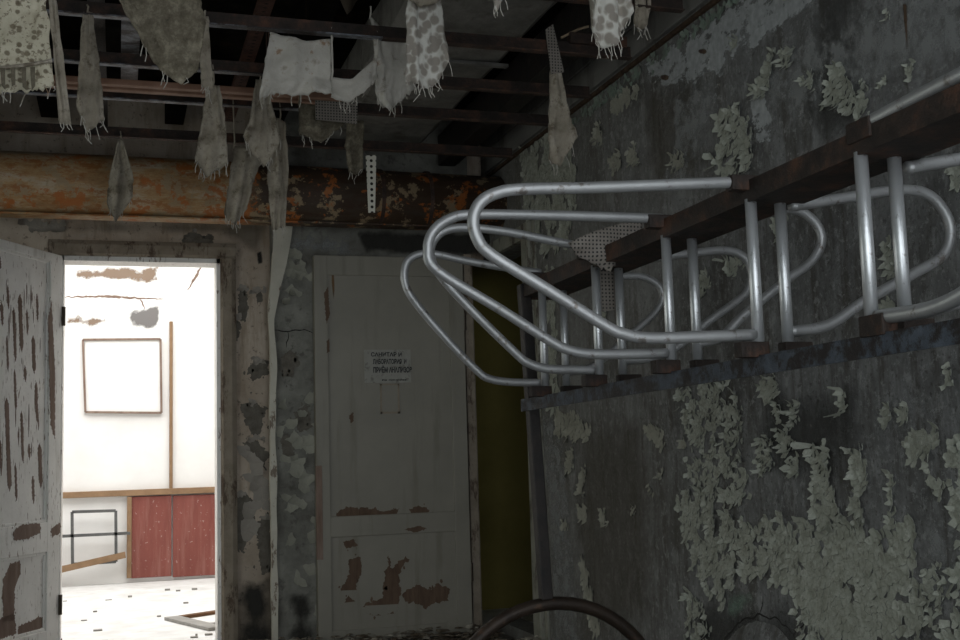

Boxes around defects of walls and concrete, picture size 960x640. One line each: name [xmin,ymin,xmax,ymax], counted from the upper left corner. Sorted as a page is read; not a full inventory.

peeling [571,0,739,177]
peeling [702,45,795,177]
peeling [794,60,886,121]
spalling [236,284,266,341]
peeling [938,361,954,391]
peeling [237,350,316,575]
peeling [545,406,609,532]
peeling [643,373,960,640]
peeling [578,554,593,602]
peeling [587,615,600,640]